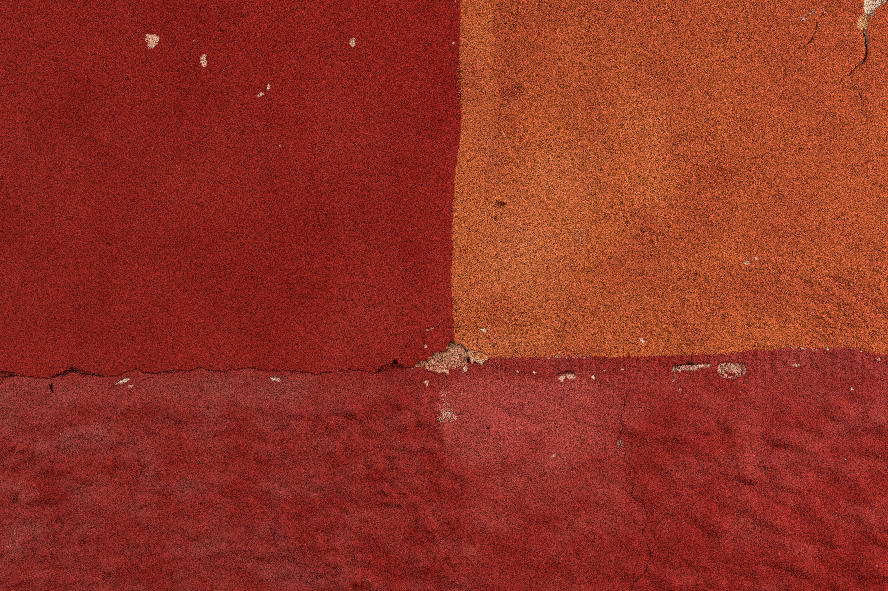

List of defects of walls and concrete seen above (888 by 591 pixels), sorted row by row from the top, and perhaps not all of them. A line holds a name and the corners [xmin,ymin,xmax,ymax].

peeling [145,34,160,49]
crack [781,4,857,96]
spalling [841,0,887,119]
crack [0,311,500,382]
spalling [412,330,488,386]
spalling [673,362,746,390]
crack [617,390,651,591]